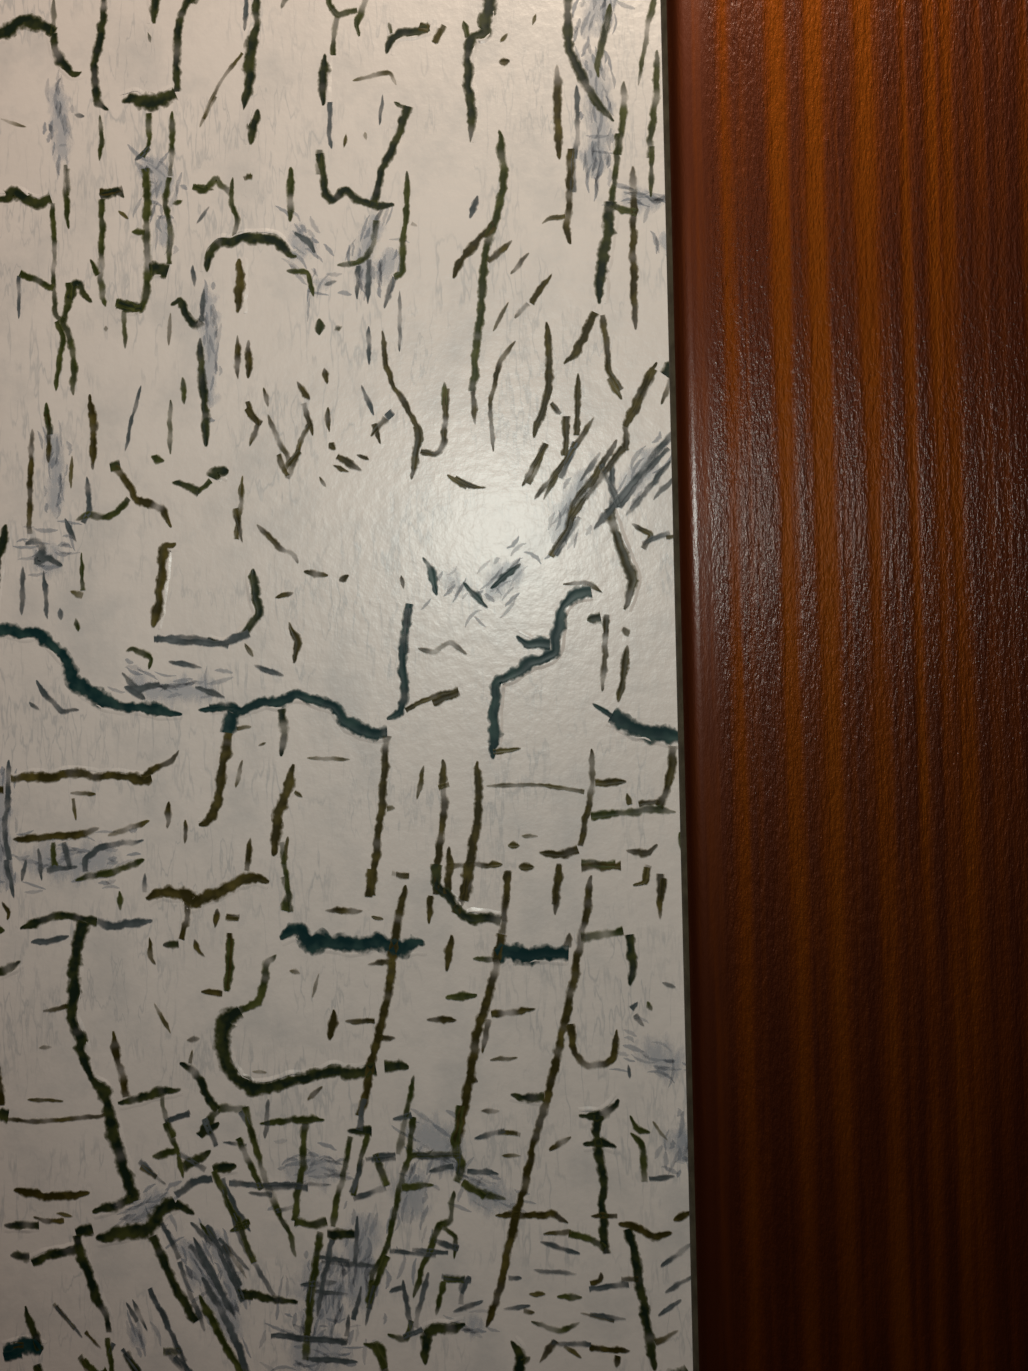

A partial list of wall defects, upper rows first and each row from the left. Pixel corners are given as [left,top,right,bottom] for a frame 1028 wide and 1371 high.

crack [0,0,691,1371]